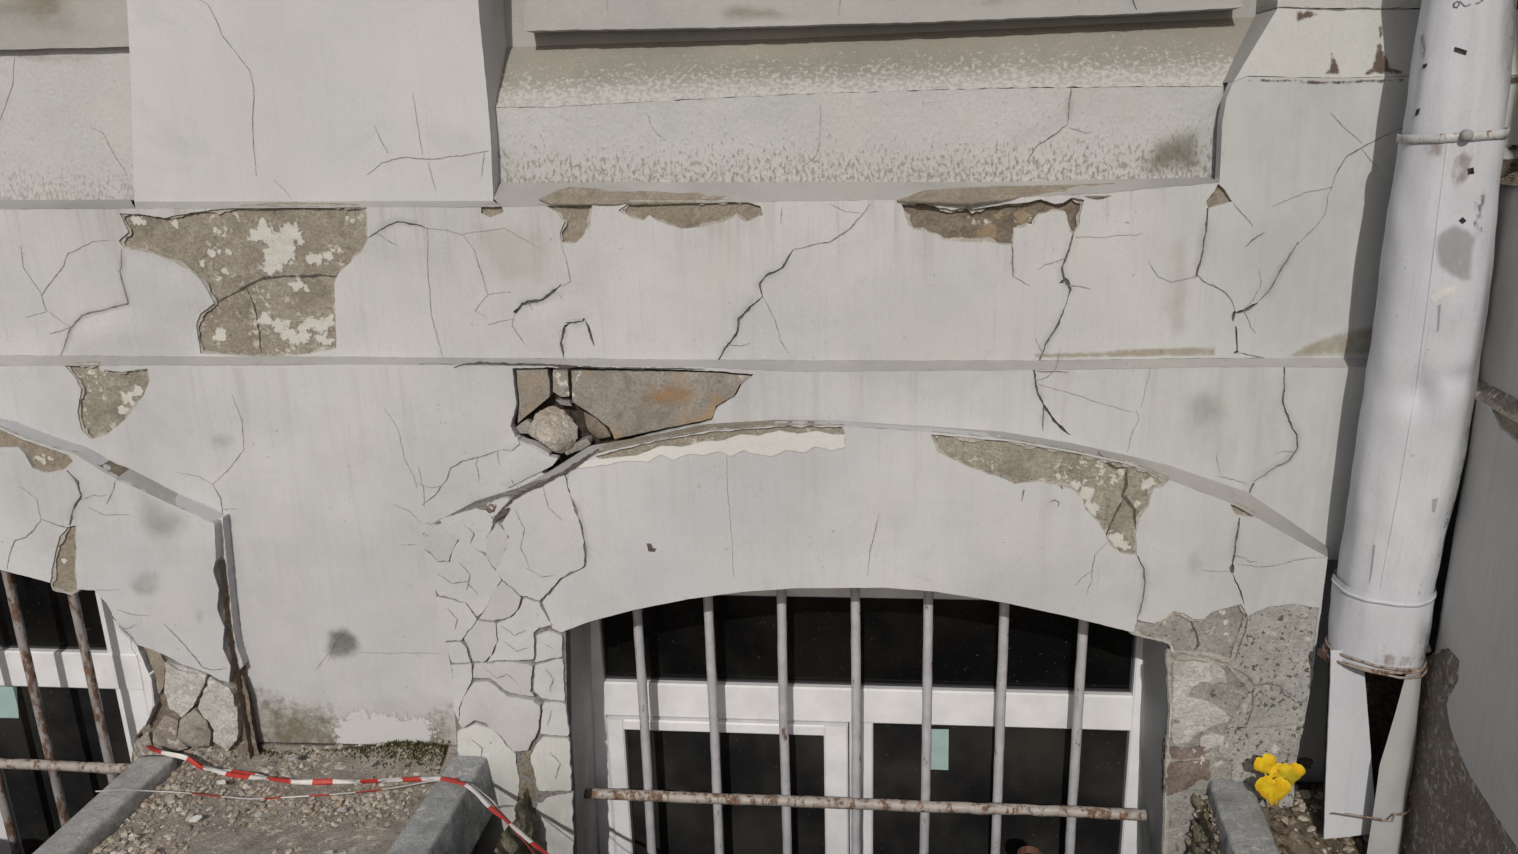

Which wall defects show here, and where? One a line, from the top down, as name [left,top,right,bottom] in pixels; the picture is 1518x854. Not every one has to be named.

crack [367,93,487,191]
crack [1027,87,1092,161]
spalling [539,187,763,243]
spalling [897,183,1115,245]
crack [20,240,129,356]
spalling [120,202,370,357]
crack [370,204,870,370]
spalling [499,367,845,488]
crack [1011,113,1403,729]
spalling [930,432,1169,555]
crack [315,410,600,854]
spalling [1129,604,1251,854]